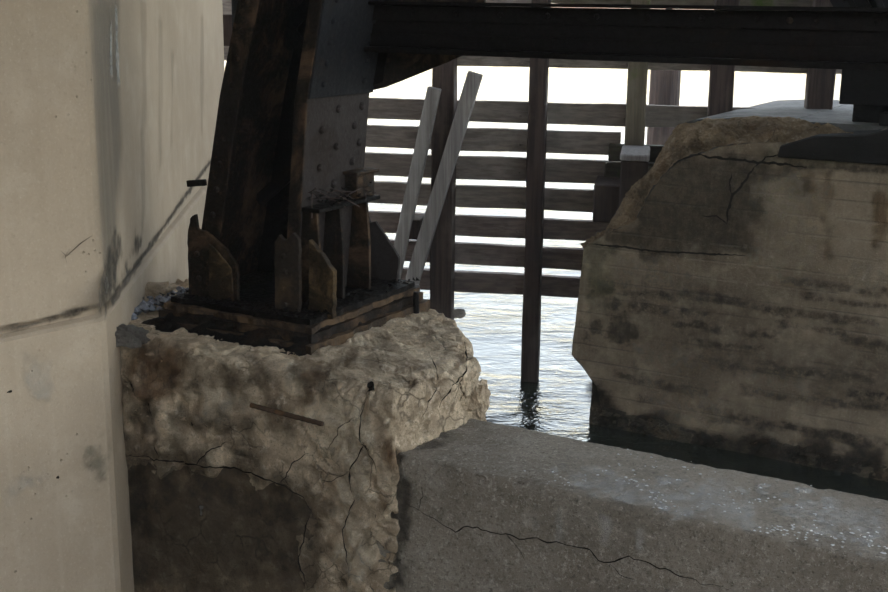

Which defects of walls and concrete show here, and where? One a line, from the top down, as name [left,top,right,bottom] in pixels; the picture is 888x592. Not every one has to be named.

spalling [580,116,854,249]
crack [696,154,807,224]
crack [587,243,746,256]
crack [129,442,313,583]
crack [322,388,376,575]
crack [422,338,468,417]
crack [406,487,723,587]
water stain [587,382,734,437]
water stain [680,417,888,481]